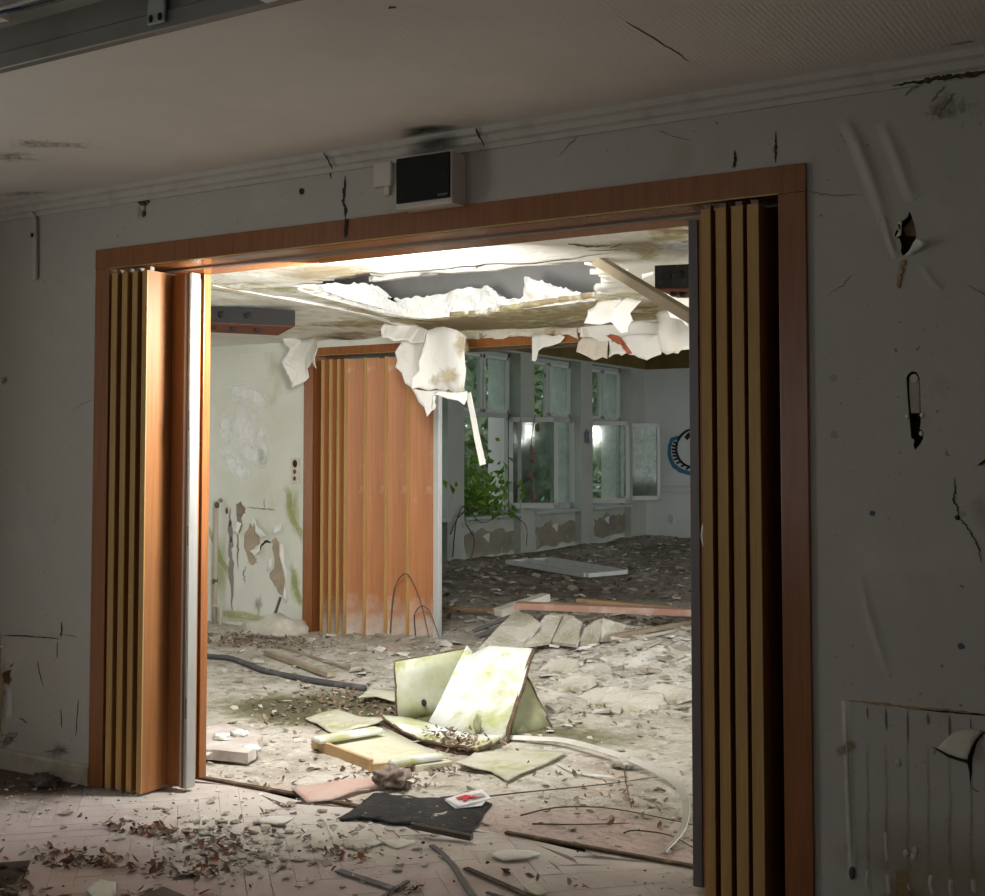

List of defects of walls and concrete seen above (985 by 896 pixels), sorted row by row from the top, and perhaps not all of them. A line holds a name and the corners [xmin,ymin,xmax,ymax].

crack [626,21,688,61]
crack [893,70,985,118]
crack [323,152,348,237]
spalling [895,211,925,289]
flaking render [297,276,599,319]
spalling [906,371,923,450]
peeling [234,502,287,604]
peeling [464,528,514,559]
peeling [535,520,575,550]
peeling [593,512,625,538]
crack [952,478,981,563]